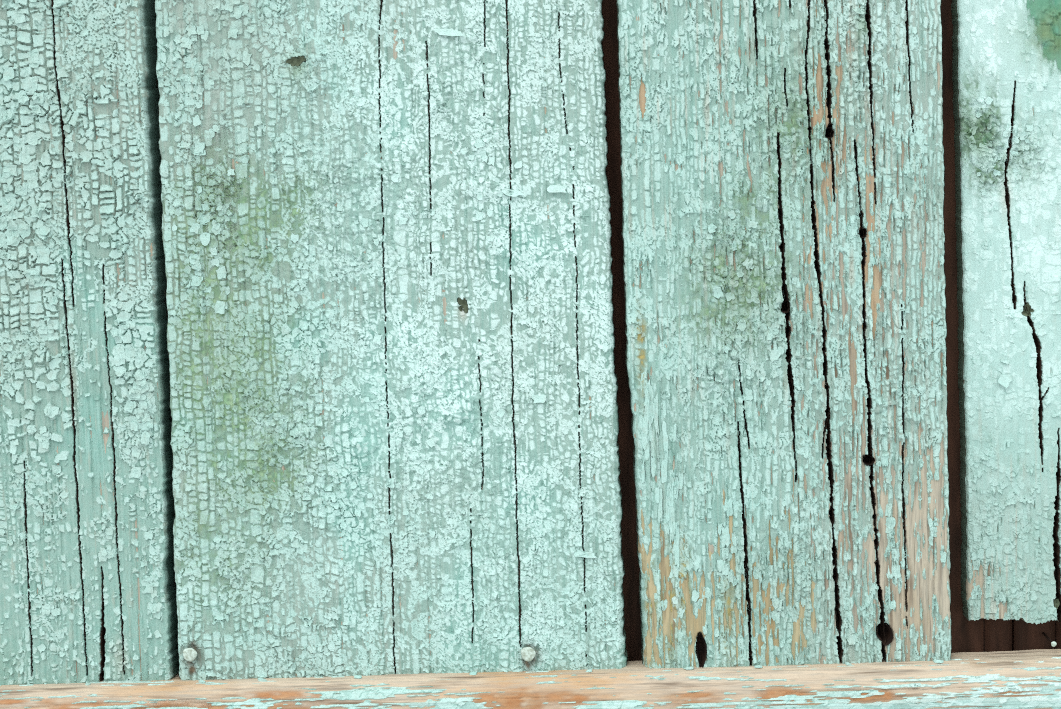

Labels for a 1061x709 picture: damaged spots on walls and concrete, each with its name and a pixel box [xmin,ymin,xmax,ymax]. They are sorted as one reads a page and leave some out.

crack [52,0,125,681]
peeling [639,77,650,119]
peeling [713,35,846,362]
crack [777,133,797,481]
crack [784,0,908,663]
peeling [851,147,882,339]
crack [1004,81,1061,623]
damp [1027,0,1061,70]
crack [24,466,33,675]
peeling [638,372,816,668]
crack [737,367,752,665]
peeling [867,422,951,662]